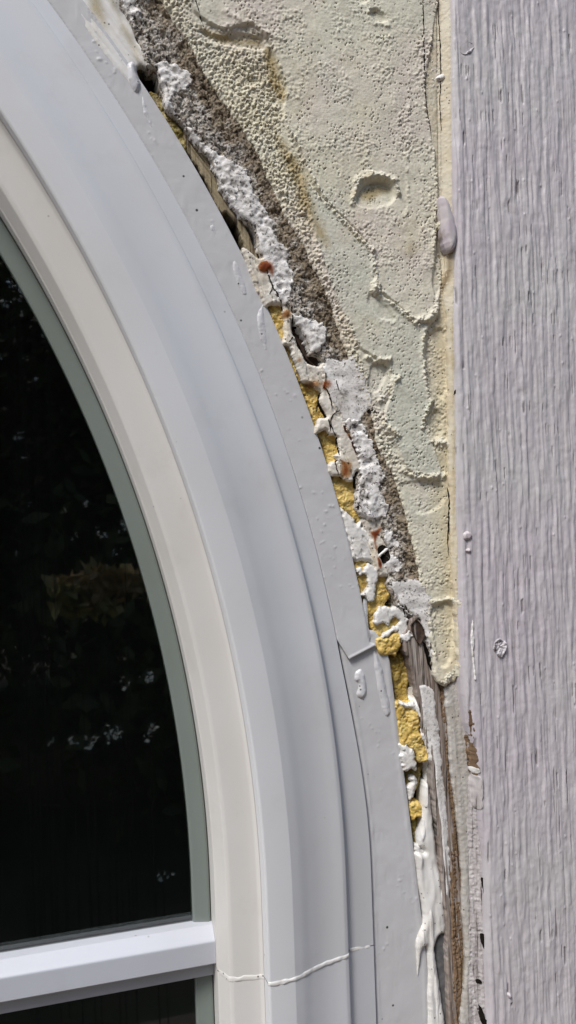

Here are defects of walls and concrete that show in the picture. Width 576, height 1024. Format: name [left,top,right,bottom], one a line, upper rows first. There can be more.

crack [422,0,442,131]
spalling [119,0,438,671]
peeling [407,685,451,896]